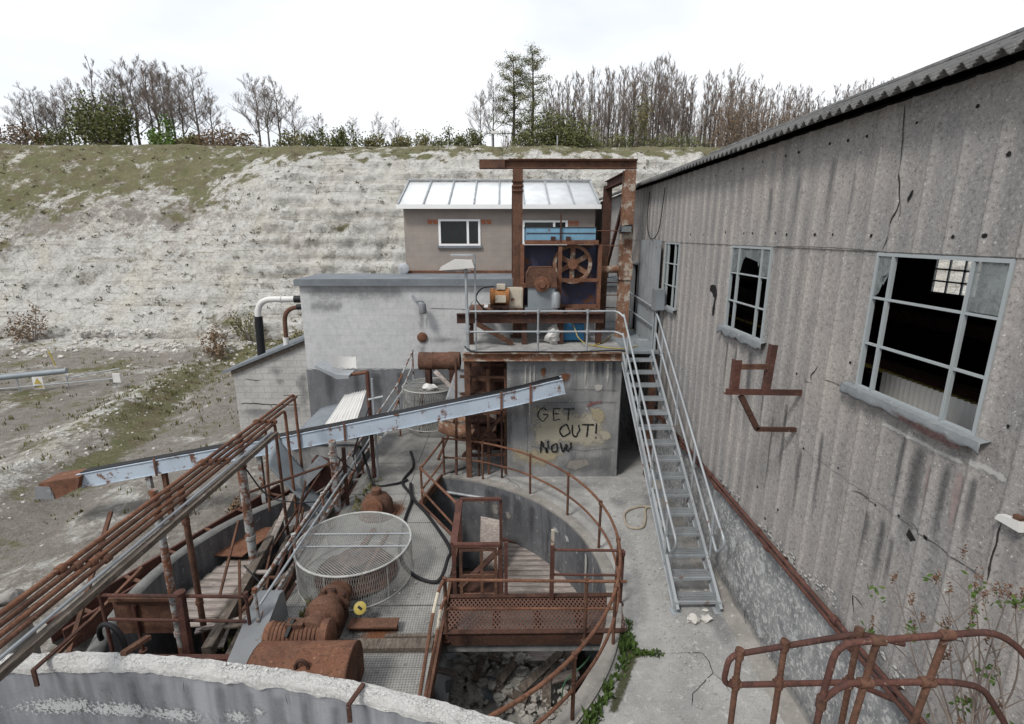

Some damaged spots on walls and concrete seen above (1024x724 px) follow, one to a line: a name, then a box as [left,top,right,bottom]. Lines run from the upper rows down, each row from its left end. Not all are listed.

crack [776,106,905,251]
peeling [531,408,611,447]
damp [896,413,959,449]
crack [909,522,1001,581]